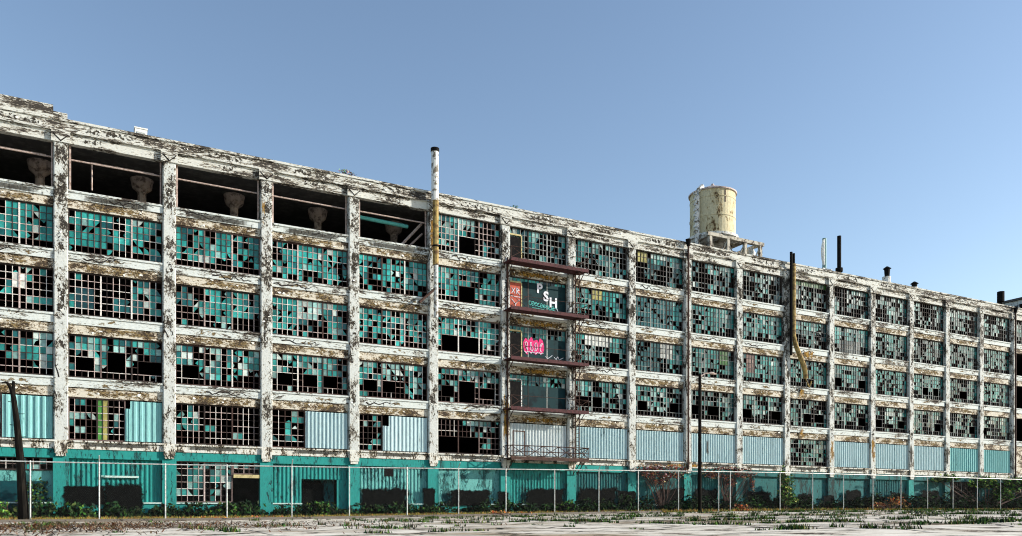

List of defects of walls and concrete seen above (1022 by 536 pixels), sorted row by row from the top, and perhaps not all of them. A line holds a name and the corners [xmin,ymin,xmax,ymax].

peeling [76,127,137,145]
peeling [78,203,143,216]
peeling [78,321,154,339]
peeling [187,330,254,348]
peeling [803,319,866,365]